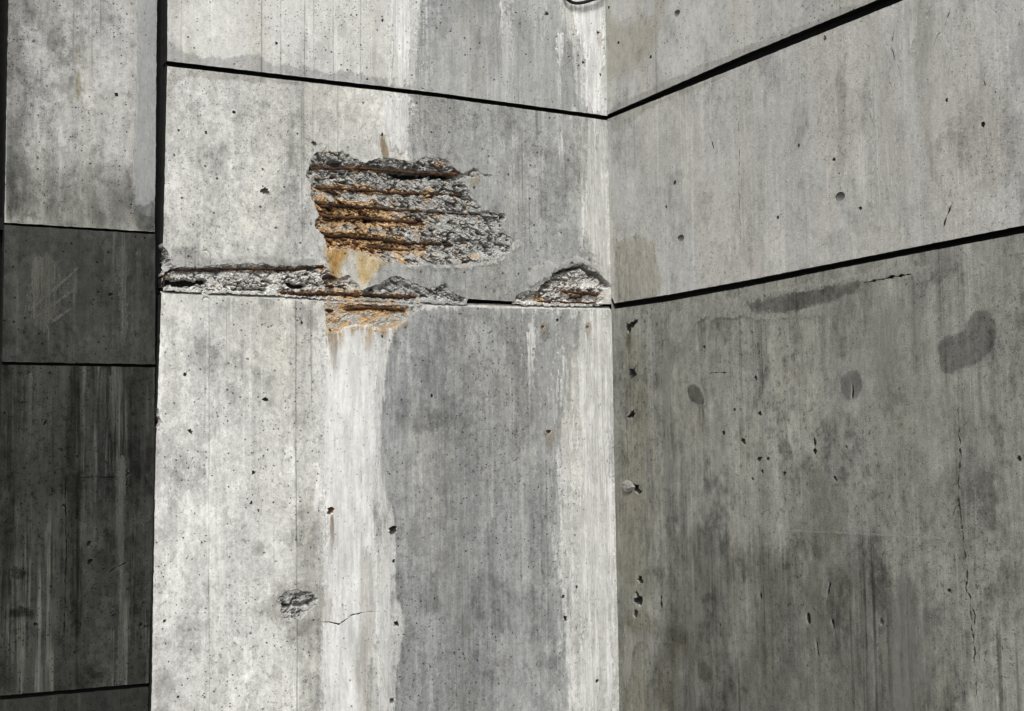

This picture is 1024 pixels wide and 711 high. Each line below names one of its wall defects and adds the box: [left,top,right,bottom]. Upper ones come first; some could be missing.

spalling [159,150,513,332]
spalling [512,243,657,307]
crack [954,412,977,694]